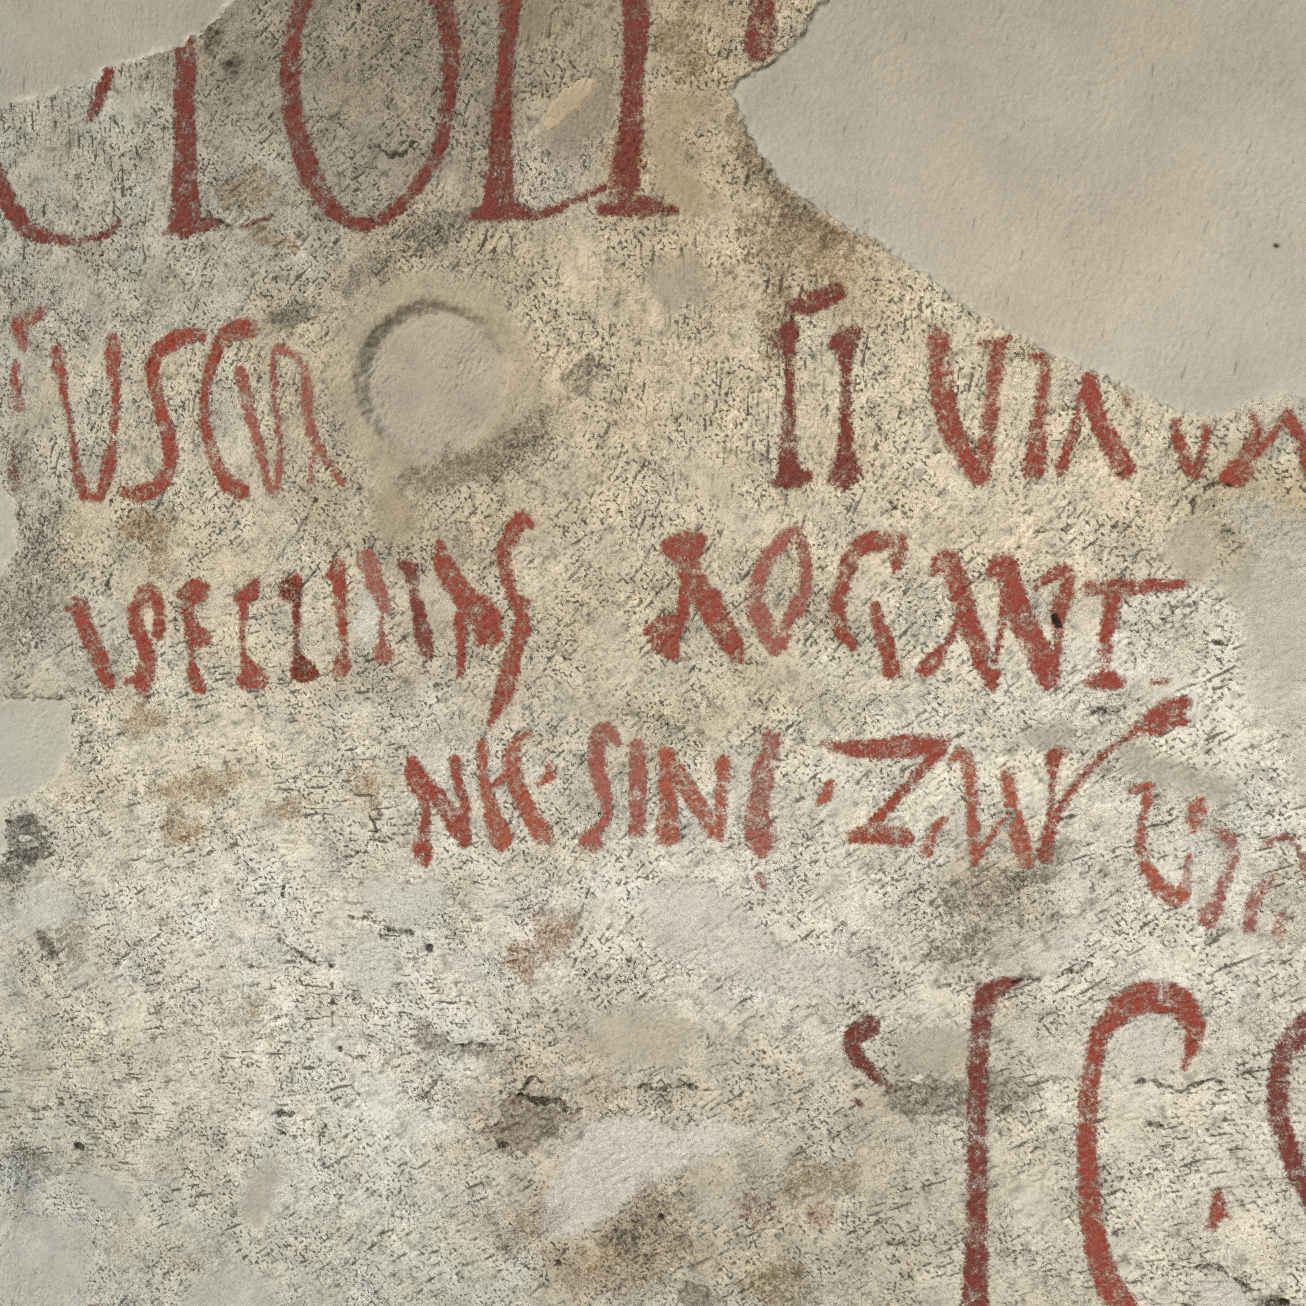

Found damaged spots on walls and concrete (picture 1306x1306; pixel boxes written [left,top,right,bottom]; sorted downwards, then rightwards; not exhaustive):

spalling [2,812,50,870]